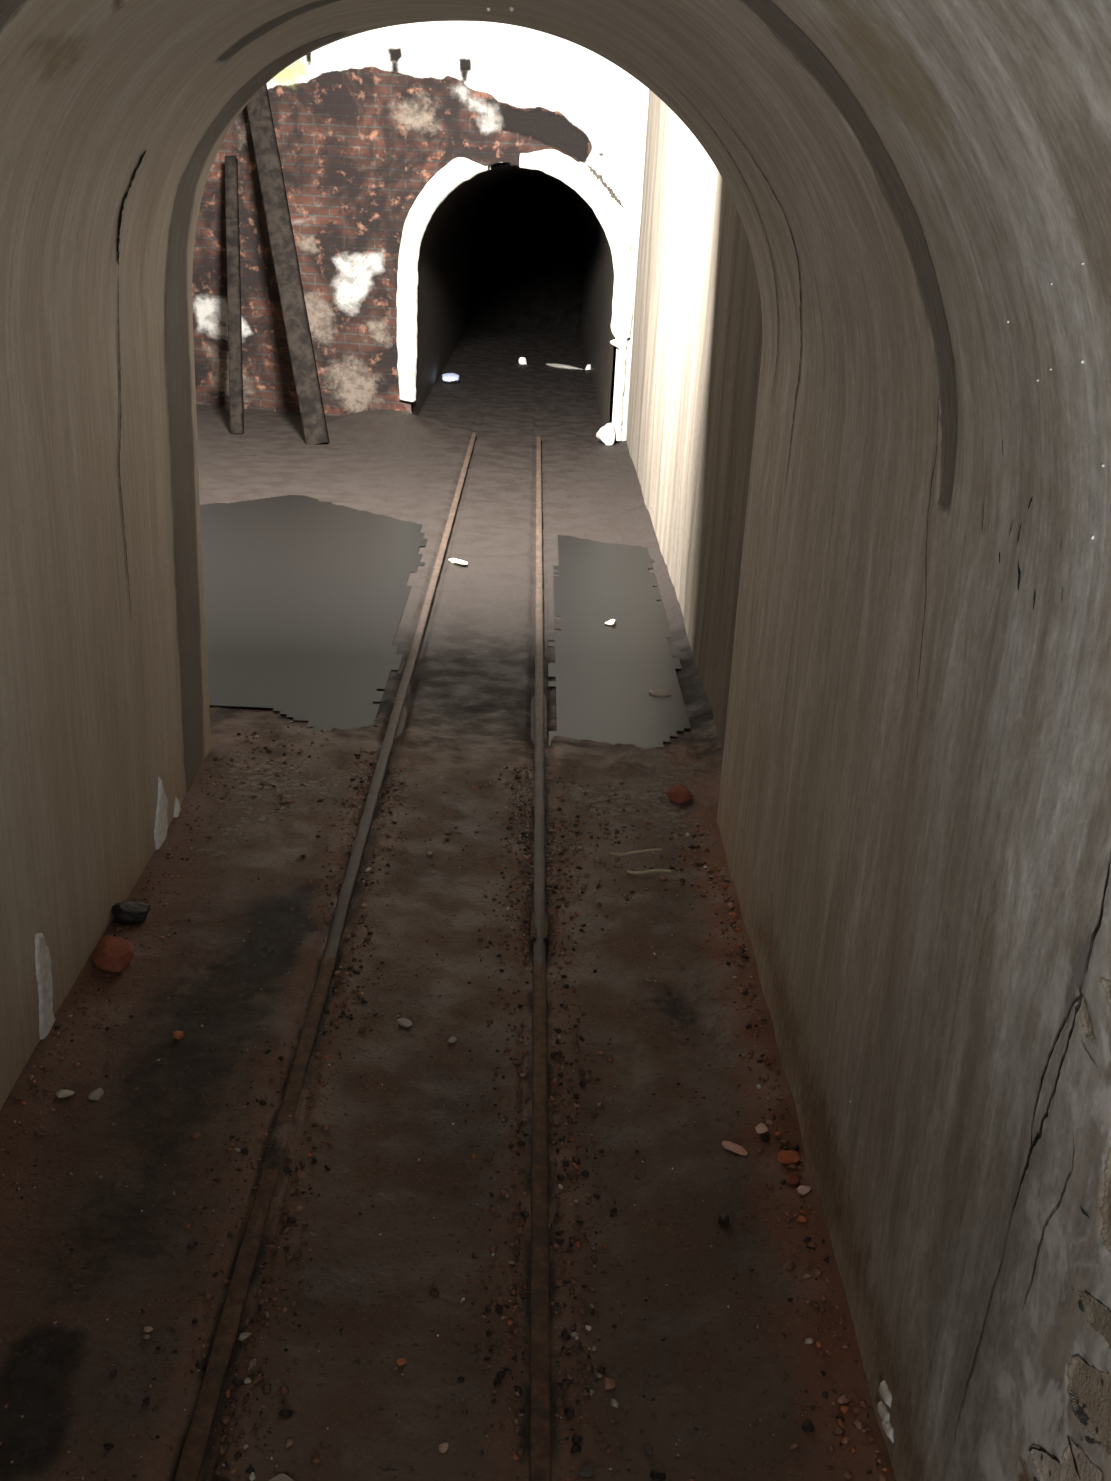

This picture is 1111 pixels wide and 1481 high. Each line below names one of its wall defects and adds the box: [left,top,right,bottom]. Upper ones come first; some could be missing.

crack [954,856,1111,1450]
spalling [1100,1148,1111,1255]
spalling [1072,1289,1111,1348]
spalling [1020,1356,1111,1481]